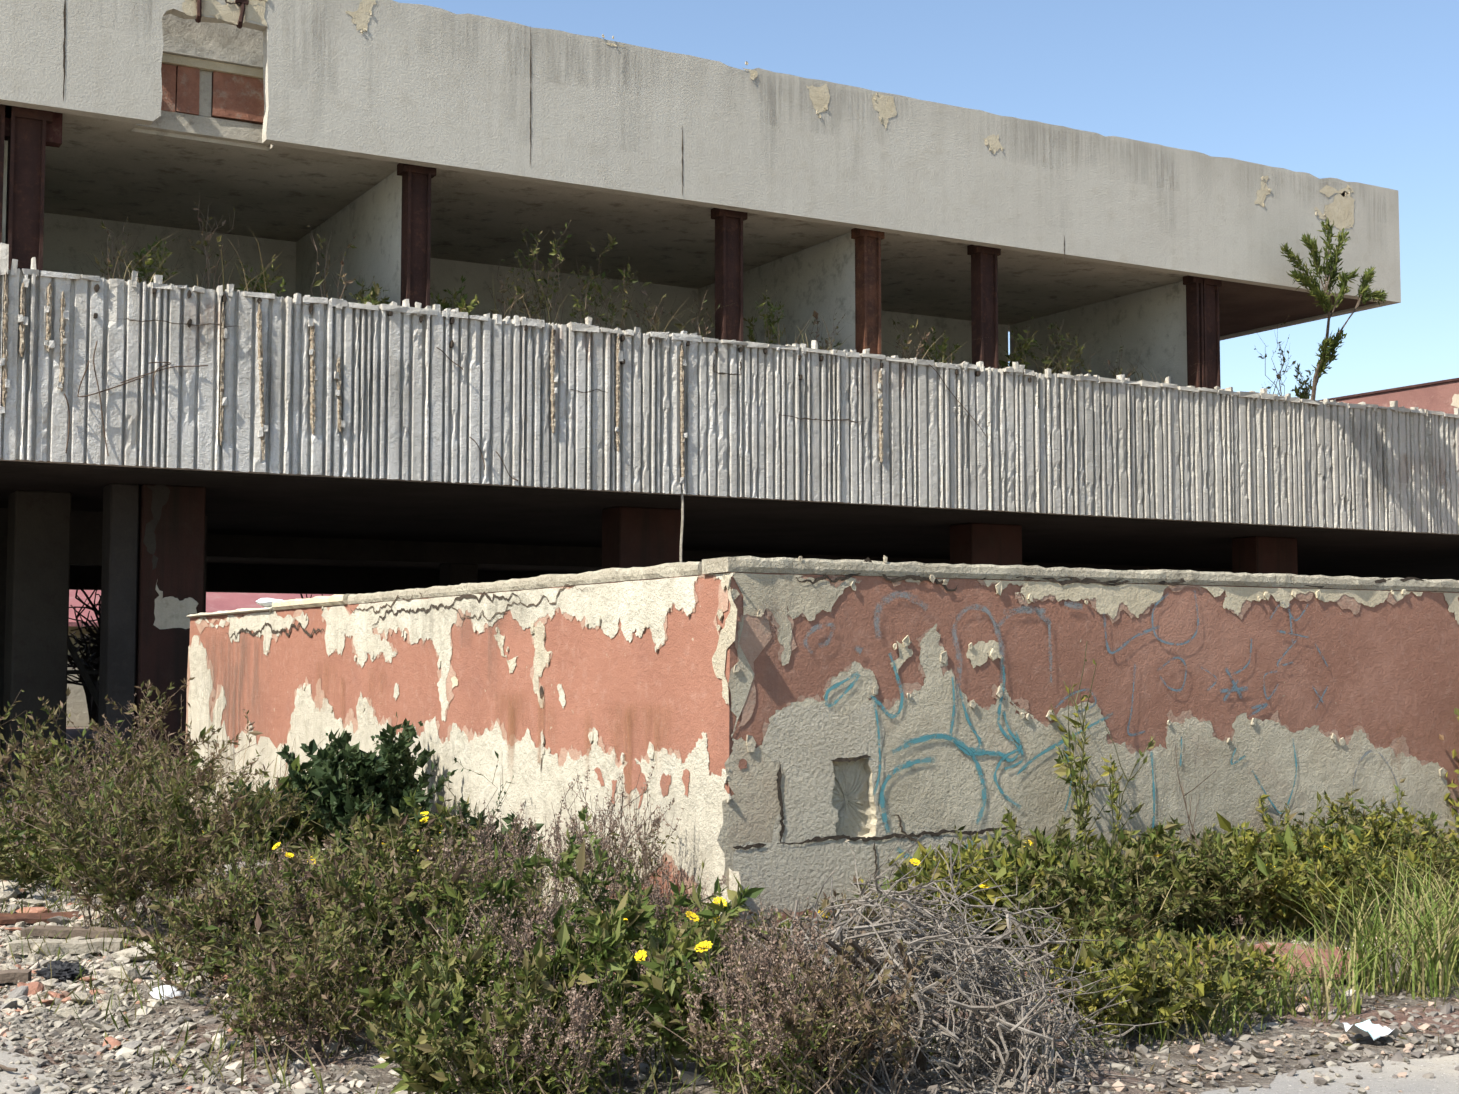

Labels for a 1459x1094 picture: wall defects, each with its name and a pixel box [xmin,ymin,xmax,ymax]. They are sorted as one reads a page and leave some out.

spalling [182,0,268,27]
peeling [806,84,830,118]
peeling [872,93,897,128]
peeling [143,484,1459,941]
crack [733,761,1023,884]